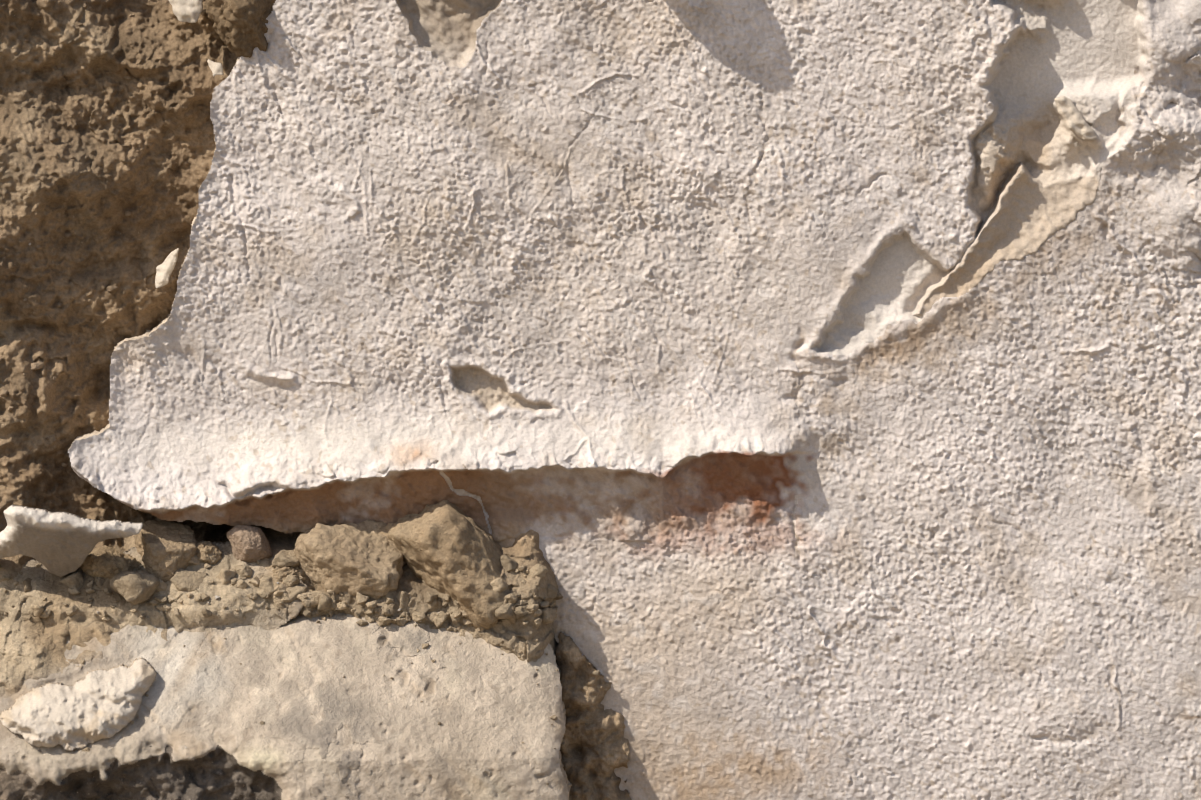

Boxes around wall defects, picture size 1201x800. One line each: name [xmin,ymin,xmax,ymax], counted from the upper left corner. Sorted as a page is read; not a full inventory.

spalling [812,0,1201,355]
spalling [110,291,177,365]
spalling [68,424,110,450]